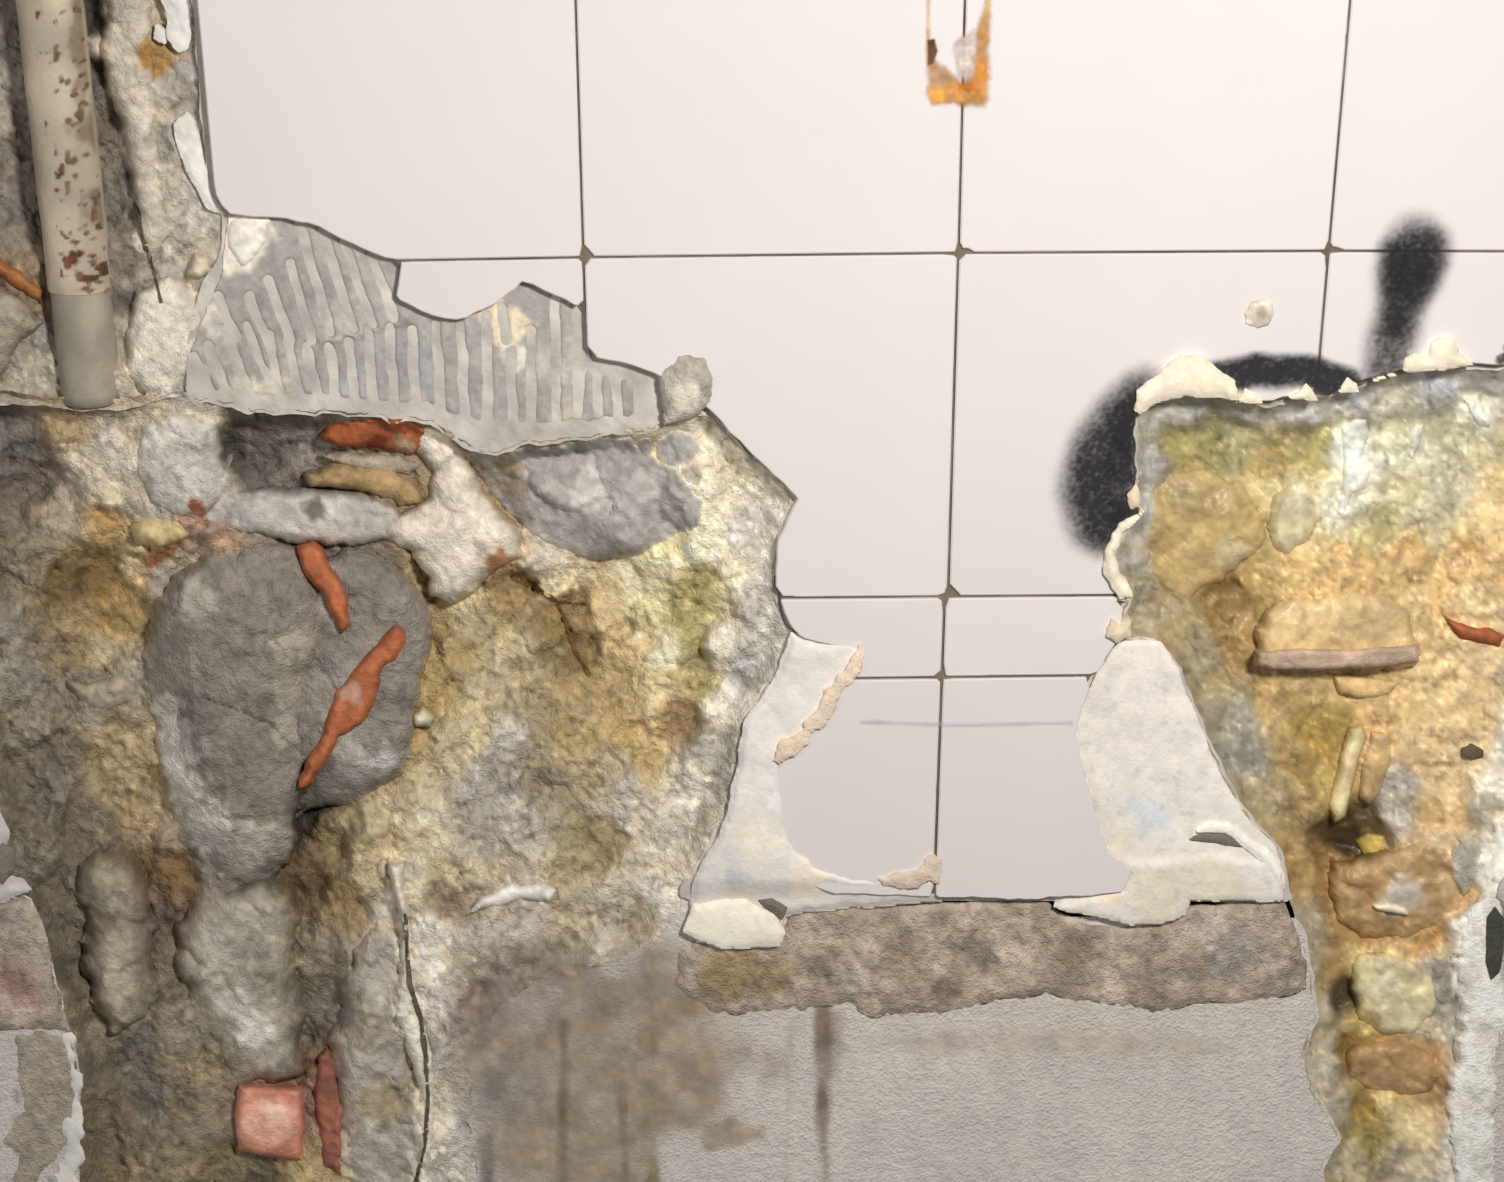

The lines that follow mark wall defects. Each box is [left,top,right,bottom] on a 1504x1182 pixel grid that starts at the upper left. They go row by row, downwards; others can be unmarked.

rust [927,1,990,105]
spalling [0,0,796,1182]
spalling [675,336,1504,1182]
crack [403,913,430,1182]
leakage [465,951,717,1182]
leakage [817,1082,828,1129]
leakage [816,1005,830,1050]